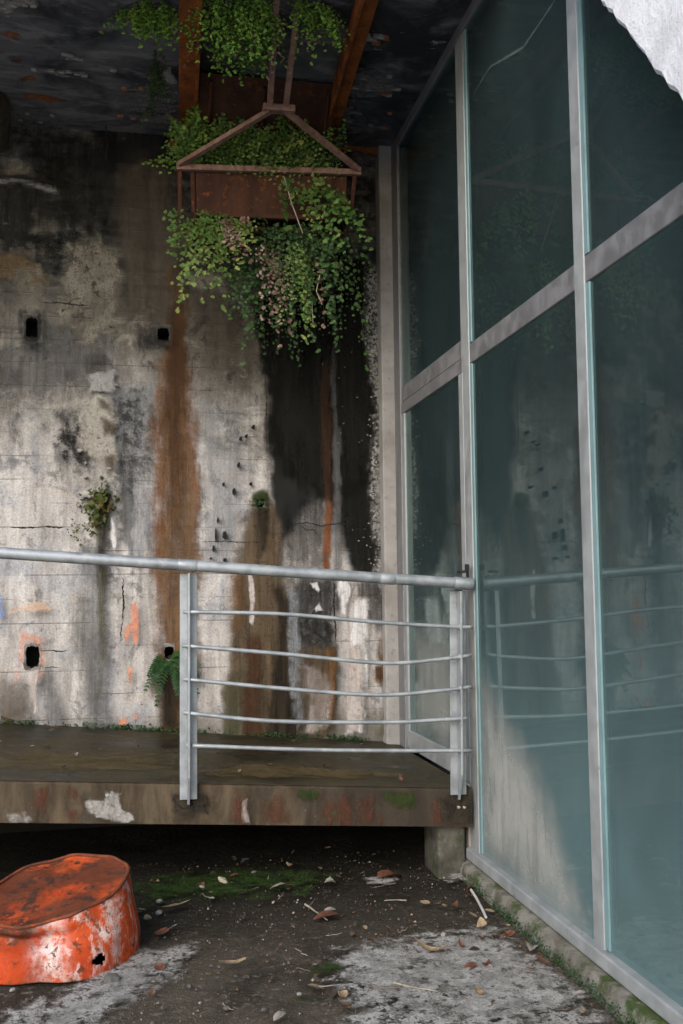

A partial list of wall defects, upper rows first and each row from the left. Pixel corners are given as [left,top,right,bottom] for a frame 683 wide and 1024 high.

crack [476,0,555,90]
mould [53,409,90,467]
corrosion [149,267,201,731]
water stain [195,253,382,738]
water stain [72,384,152,726]
crack [118,579,126,640]
spalling [85,791,134,823]